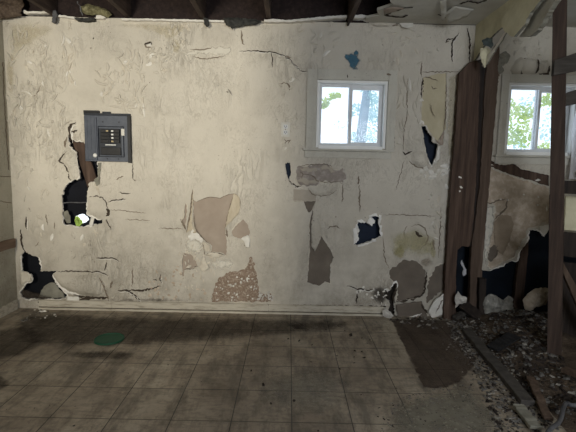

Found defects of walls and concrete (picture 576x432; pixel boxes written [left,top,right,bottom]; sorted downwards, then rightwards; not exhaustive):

crack [241,31,306,73]
crack [420,28,472,76]
peeling [419,73,447,167]
hole [62,132,103,228]
hole [19,229,68,301]
crack [94,257,163,302]
peeling [181,190,272,304]
peeling [285,162,346,286]
hole [353,213,383,247]
peeling [384,260,444,315]
hole [456,246,470,298]
peeling [482,167,549,310]